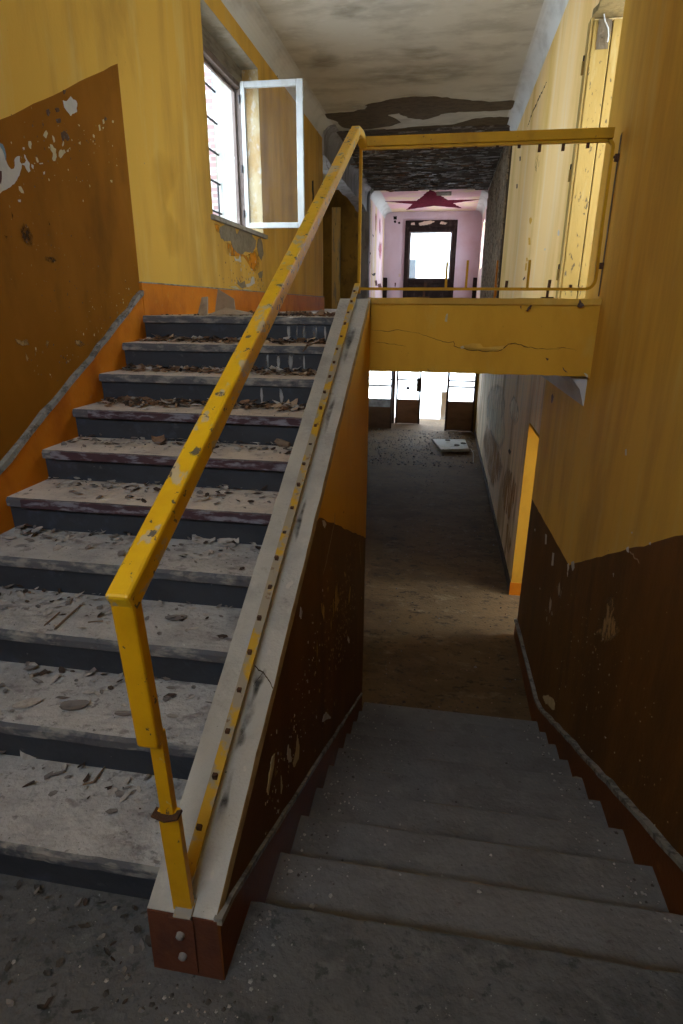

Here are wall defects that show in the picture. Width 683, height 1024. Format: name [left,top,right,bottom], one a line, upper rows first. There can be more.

flaking render [325,96,515,130]
peeling [0,96,114,202]
flaking render [219,224,264,290]
crack [374,329,569,352]